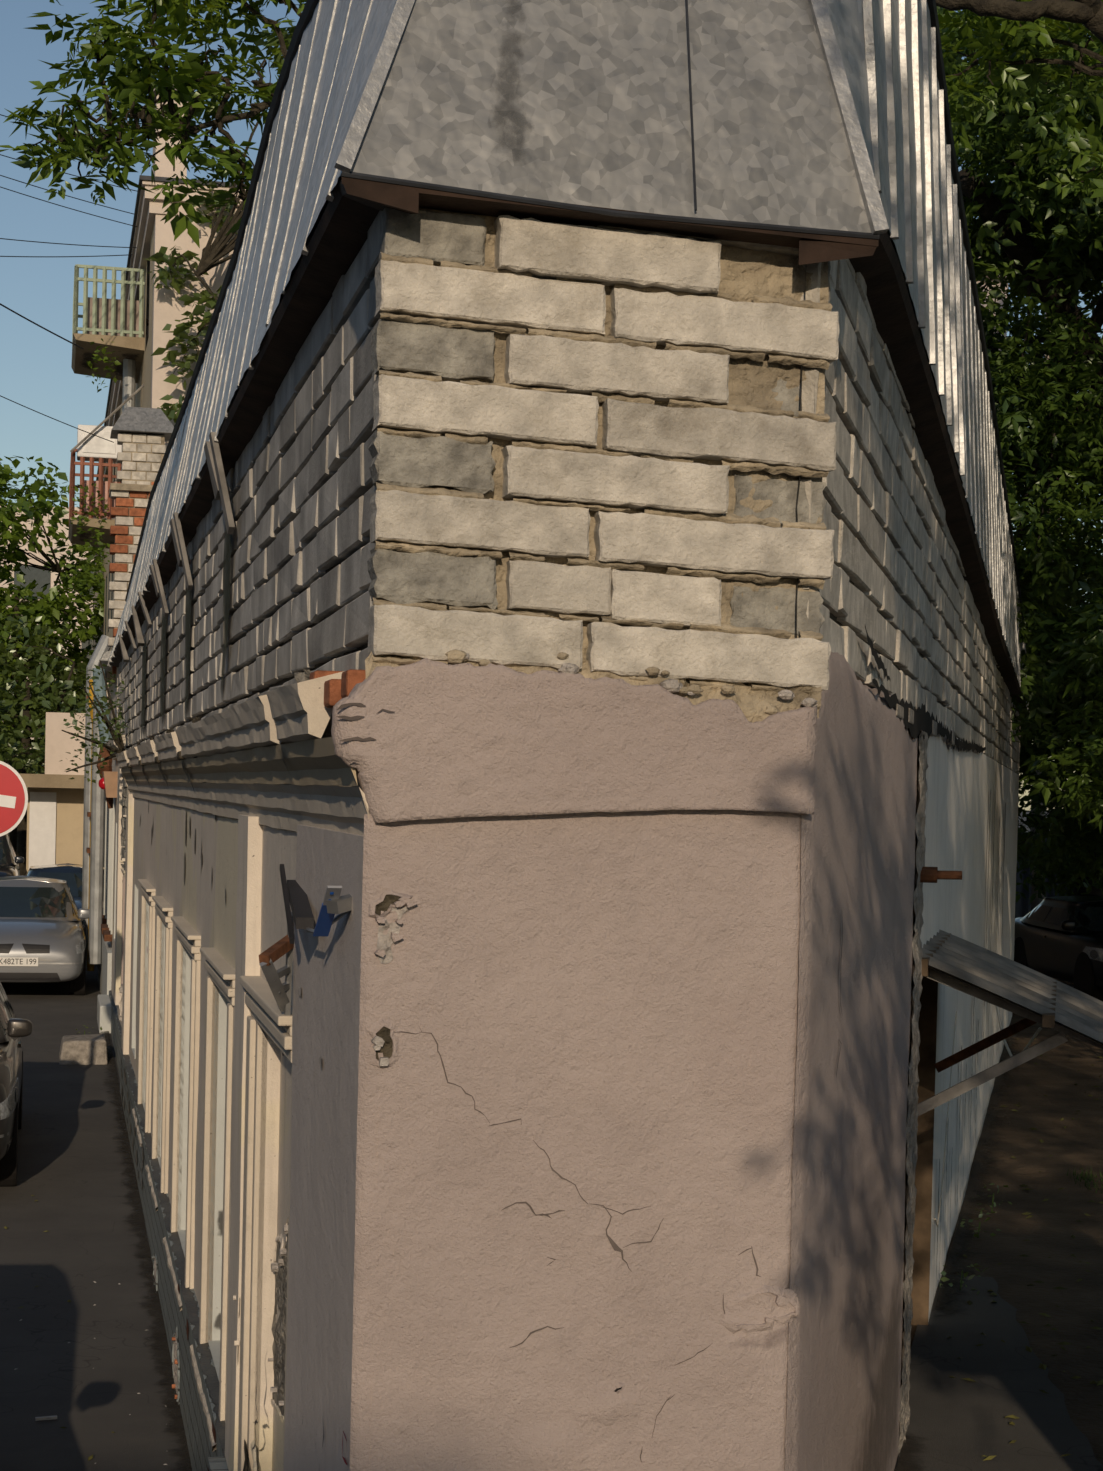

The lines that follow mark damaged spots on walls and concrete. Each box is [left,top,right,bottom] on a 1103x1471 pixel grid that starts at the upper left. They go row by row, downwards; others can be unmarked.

spalling [368,890,418,964]
spalling [366,1017,399,1069]
crack [399,1029,664,1270]
spalling [268,1217,288,1423]